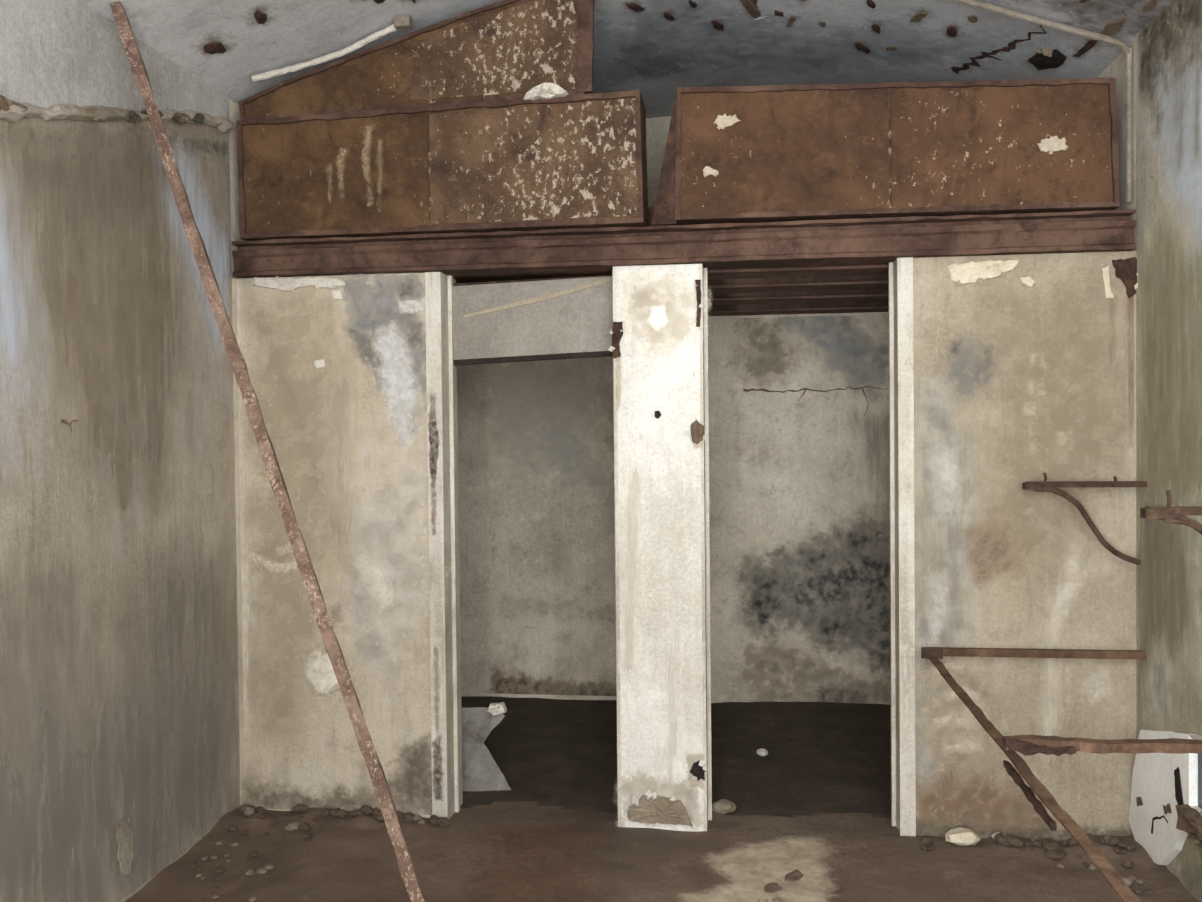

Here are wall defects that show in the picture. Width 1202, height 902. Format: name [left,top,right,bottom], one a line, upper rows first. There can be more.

spalling [202,37,229,54]
crack [951,25,1047,74]
spalling [1024,16,1126,70]
damp [1138,0,1202,276]
spalling [947,258,1036,287]
damp [0,121,241,519]
crack [743,386,888,417]
damp [238,273,427,718]
spalling [303,648,352,696]
damp [743,644,890,705]
damp [241,736,432,815]
spalling [620,755,708,826]